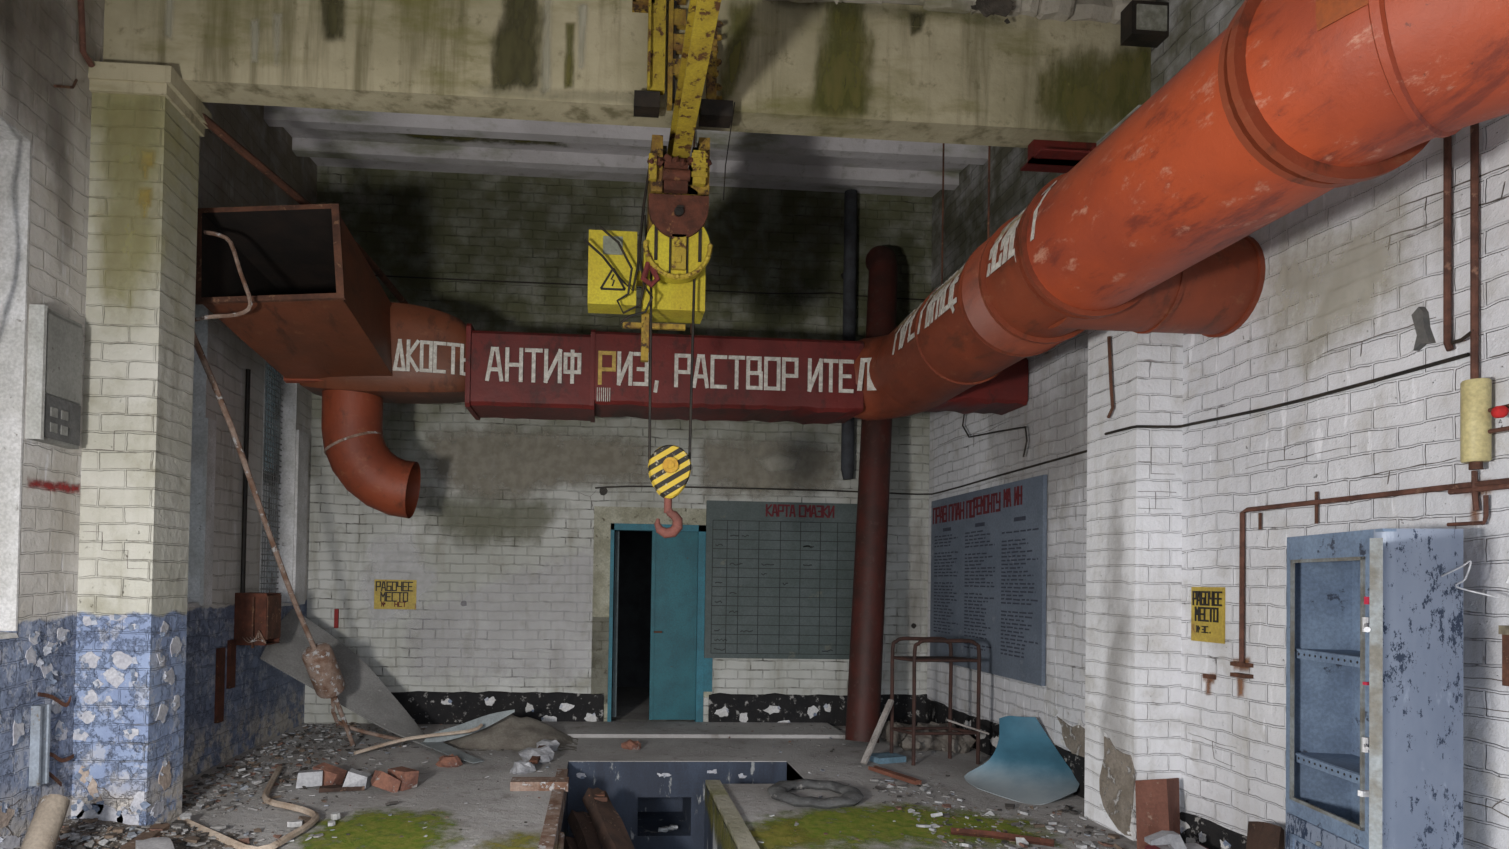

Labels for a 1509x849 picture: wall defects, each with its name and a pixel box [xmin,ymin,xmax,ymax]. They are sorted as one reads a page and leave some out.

leakage [492,0,586,92]
leakage [813,2,873,114]
leakage [104,100,154,297]